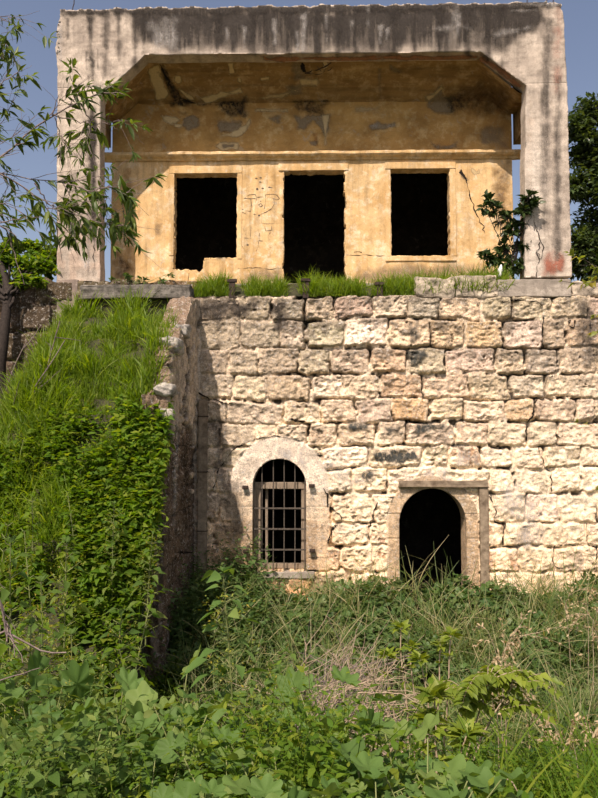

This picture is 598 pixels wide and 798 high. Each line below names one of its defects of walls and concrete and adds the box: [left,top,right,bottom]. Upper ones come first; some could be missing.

peeling [148,65,168,100]
crack [159,64,196,106]
peeling [174,63,242,103]
water stain [60,2,561,109]
peeling [263,55,521,98]
peeling [217,120,250,151]
peeling [256,109,329,145]
crack [459,169,485,232]
crack [534,223,544,277]
crack [323,488,342,544]
crack [489,495,506,545]